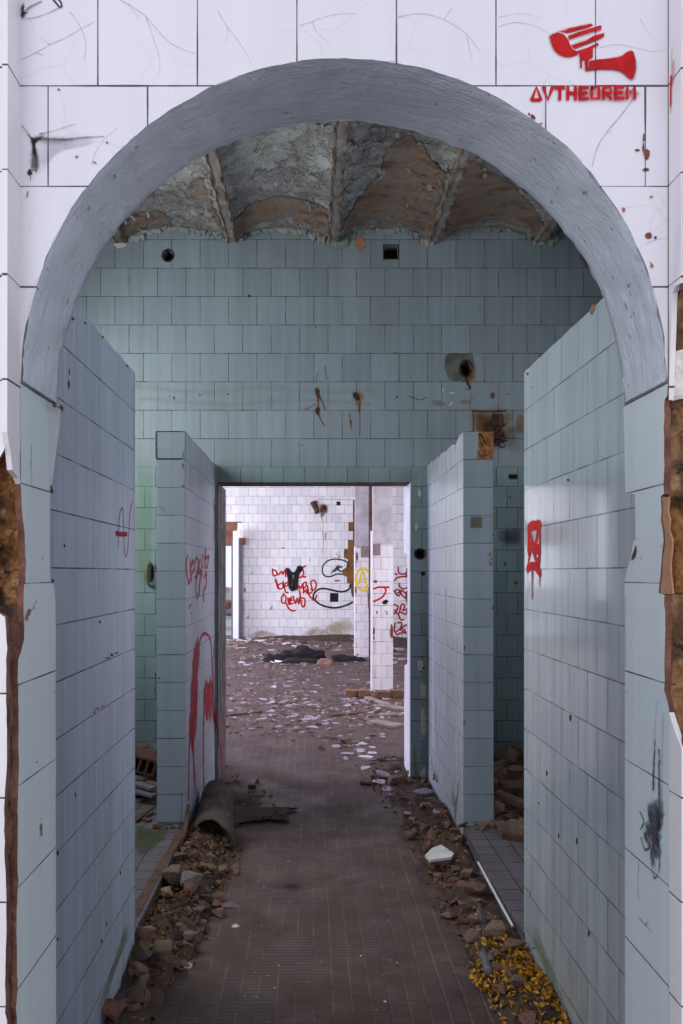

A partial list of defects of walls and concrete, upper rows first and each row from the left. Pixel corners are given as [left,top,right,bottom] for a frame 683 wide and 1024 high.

damp [22,125,87,198]
flaking render [111,122,567,260]
corrosion [306,367,327,426]
corrosion [472,410,524,438]
spalling [660,292,683,735]
spalling [0,455,31,1012]
damp [638,743,660,879]